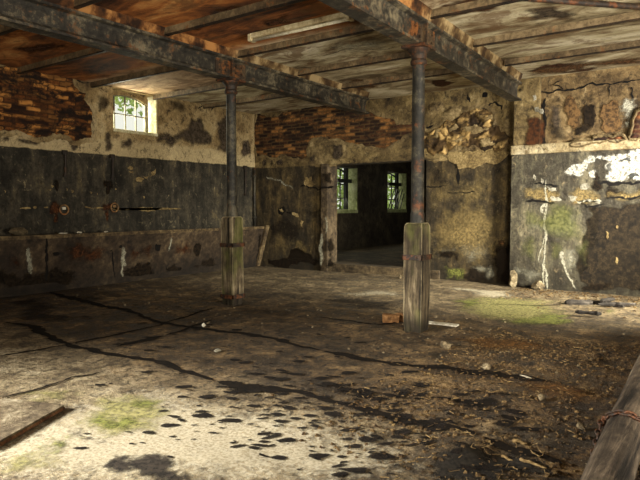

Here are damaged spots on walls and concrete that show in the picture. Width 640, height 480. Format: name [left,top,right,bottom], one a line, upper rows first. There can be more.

corrosion [264,15,286,26]
spalling [0,65,97,146]
spalling [254,106,412,164]
corrosion [432,79,453,87]
spalling [424,92,513,169]
crack [541,79,640,144]
spalling [569,100,640,148]
crack [0,239,567,465]